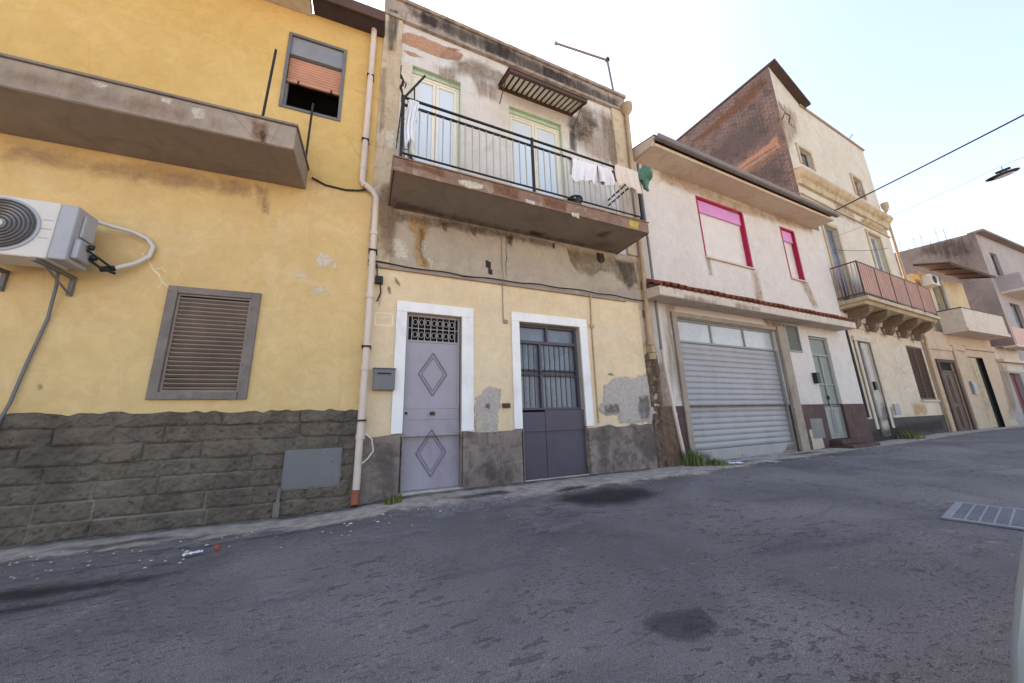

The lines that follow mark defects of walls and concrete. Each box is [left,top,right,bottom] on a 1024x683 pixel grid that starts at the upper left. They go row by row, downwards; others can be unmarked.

damp [389,10,398,50]
spalling [385,33,463,149]
damp [416,13,616,163]
peeling [316,253,337,269]
damp [381,186,635,288]